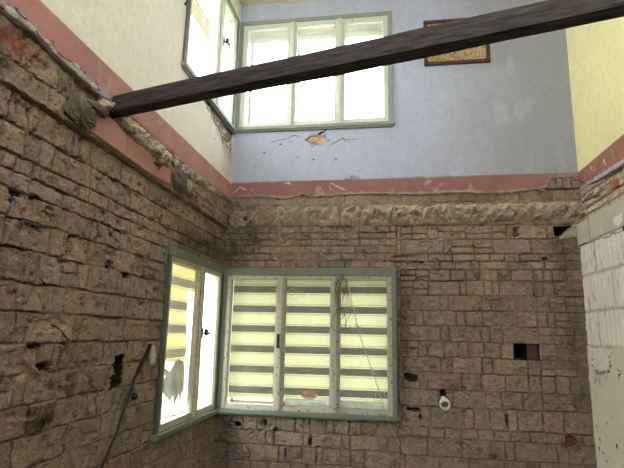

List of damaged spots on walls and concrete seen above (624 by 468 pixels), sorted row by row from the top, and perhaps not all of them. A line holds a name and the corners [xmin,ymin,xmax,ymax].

spalling [0,0,252,203]
spalling [304,130,330,147]